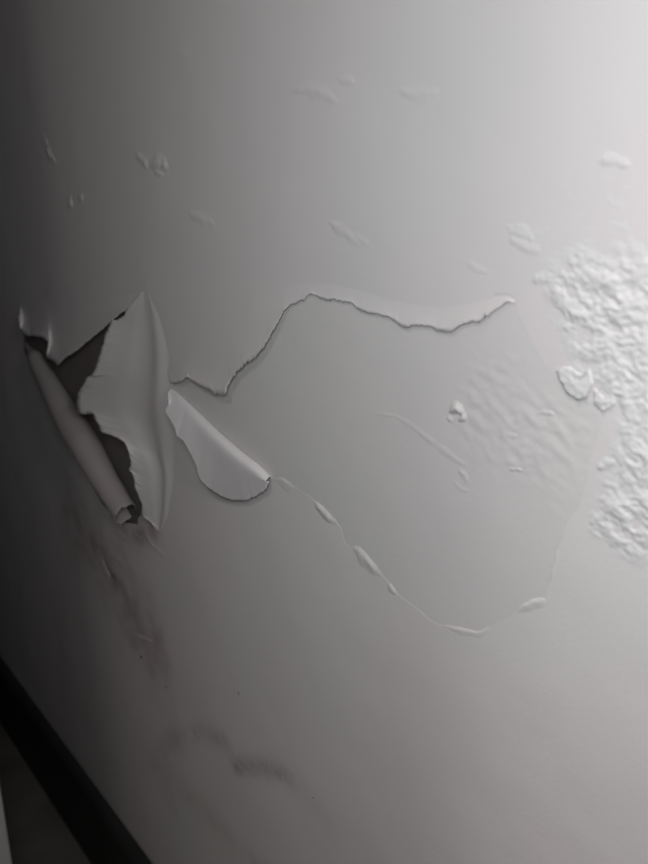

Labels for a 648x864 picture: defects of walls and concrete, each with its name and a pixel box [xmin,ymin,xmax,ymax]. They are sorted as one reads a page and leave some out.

peeling [18,283,602,638]